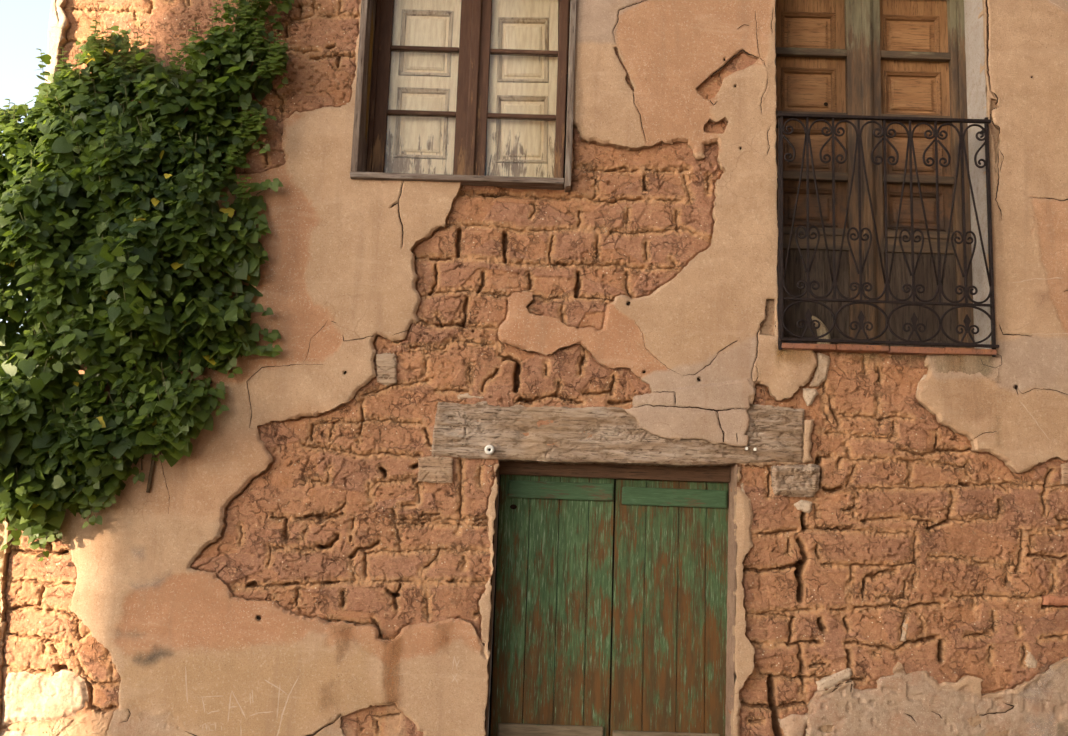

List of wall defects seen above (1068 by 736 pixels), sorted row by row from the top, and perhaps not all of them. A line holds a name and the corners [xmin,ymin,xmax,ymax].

spalling [60,0,361,180]
crack [391,181,404,245]
crack [986,0,1004,219]
spalling [191,119,727,658]
spalling [0,528,121,736]
crack [306,715,341,736]
spalling [340,703,423,736]
spalling [728,351,1068,736]